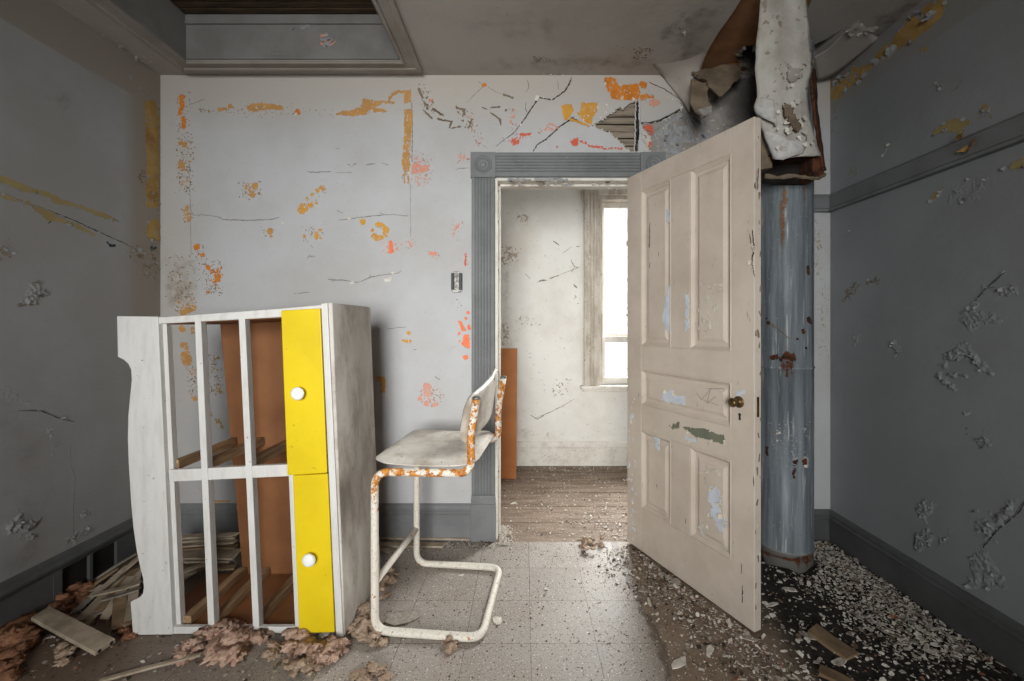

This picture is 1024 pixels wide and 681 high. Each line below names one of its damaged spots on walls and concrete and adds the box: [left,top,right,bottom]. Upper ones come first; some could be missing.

peeling [176,77,661,223]
crack [496,73,577,151]
crack [634,82,683,152]
flaking render [641,0,760,158]
peeling [774,48,814,151]
crack [8,197,155,258]
peeling [0,100,224,401]
crack [189,164,279,236]
peeling [297,185,326,240]
crack [294,270,402,294]
peeling [348,216,416,254]
corrosion [770,316,812,377]